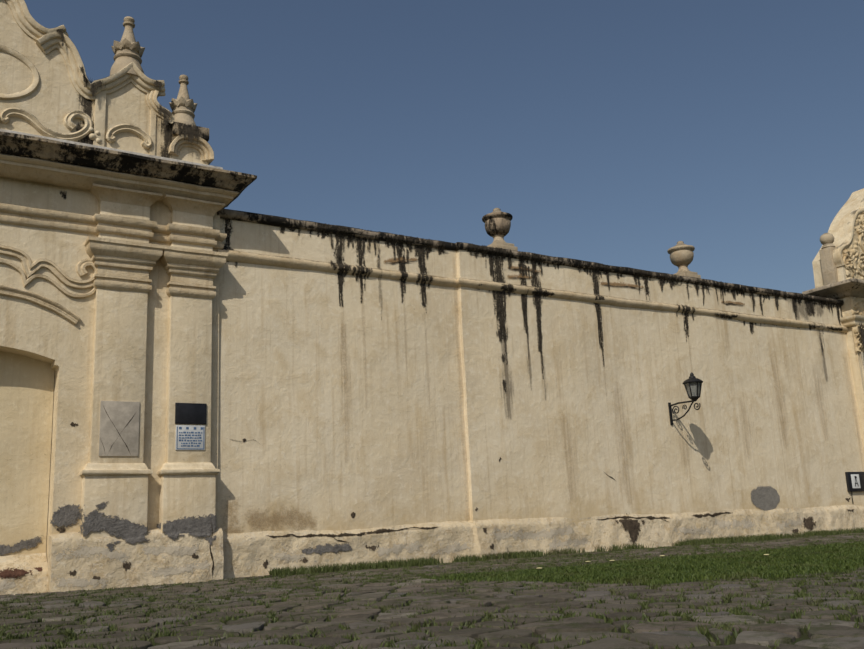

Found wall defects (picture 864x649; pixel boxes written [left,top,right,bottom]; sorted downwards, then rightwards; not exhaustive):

damp [76,67,106,145]
damp [157,105,203,158]
damp [280,218,446,313]
damp [467,244,561,379]
damp [577,264,844,365]
spalling [0,567,42,593]
spalling [0,535,43,556]
crack [208,522,216,577]
spalling [263,543,352,568]
crack [266,527,437,542]
peeling [366,541,422,557]
spalling [615,513,646,544]